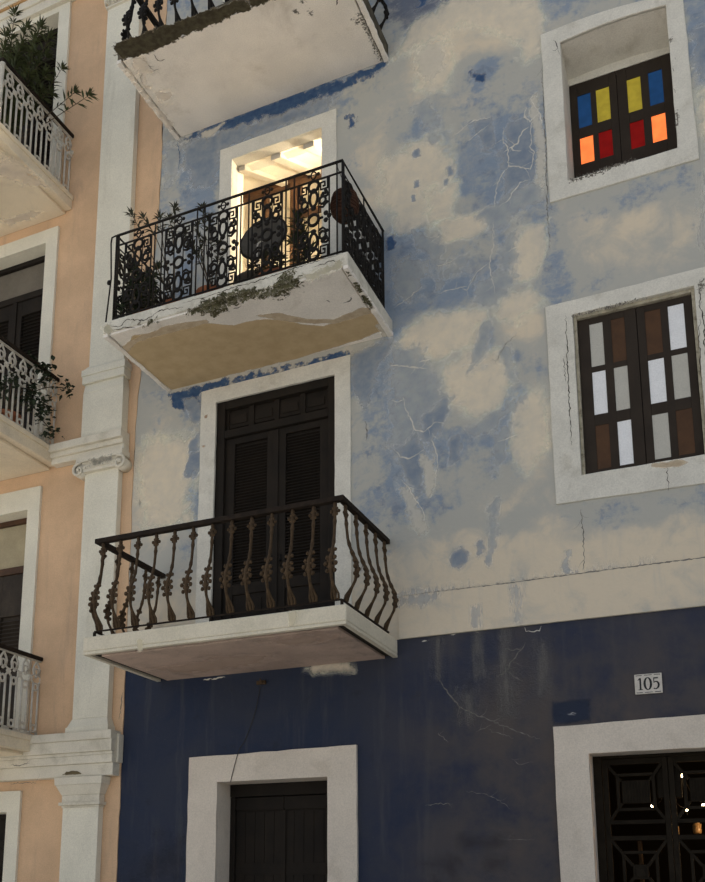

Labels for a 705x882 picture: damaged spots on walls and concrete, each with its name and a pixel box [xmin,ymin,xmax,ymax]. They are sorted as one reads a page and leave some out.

peeling [402,0,543,57]
peeling [468,70,486,82]
crack [440,69,555,294]
peeling [470,96,545,200]
peeling [168,224,545,533]
crack [563,320,572,445]
crack [697,280,705,378]
crack [392,398,444,478]